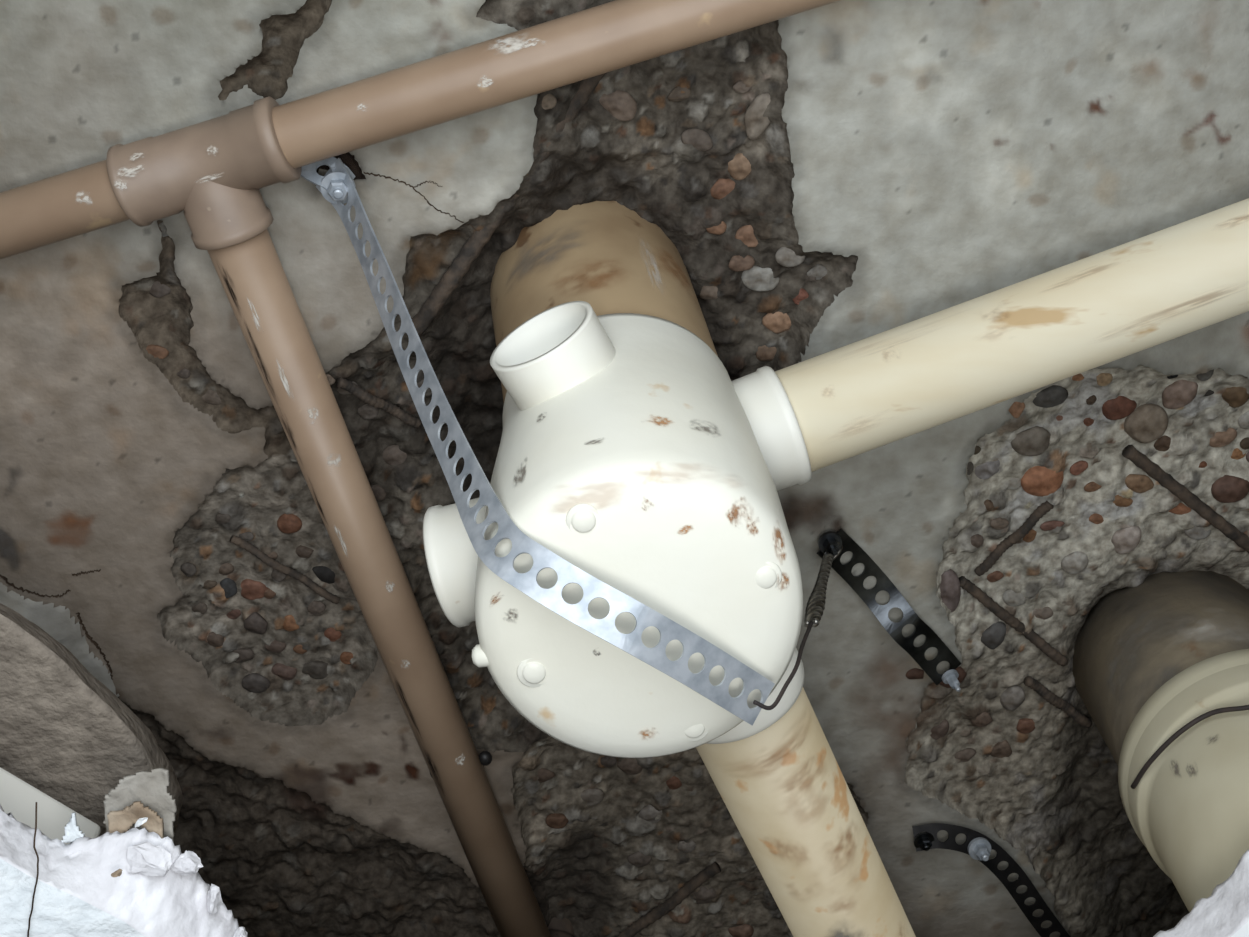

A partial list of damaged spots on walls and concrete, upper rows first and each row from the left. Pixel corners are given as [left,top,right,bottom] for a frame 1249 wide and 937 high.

spalling [218,0,332,100]
spalling [476,0,615,31]
spalling [316,152,366,180]
spalling [118,220,379,726]
spalling [325,20,858,937]
spalling [904,365,1249,937]
peeling [61,812,85,843]
spalling [103,697,500,937]
spalling [847,783,869,827]